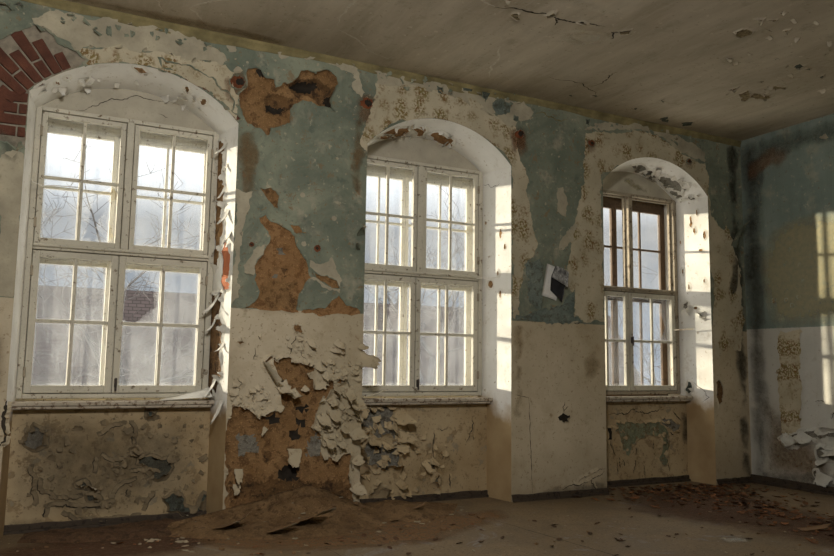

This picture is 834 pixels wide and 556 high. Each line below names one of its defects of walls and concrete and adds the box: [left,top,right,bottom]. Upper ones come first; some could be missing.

crack [481,0,627,39]
flaking render [0,22,102,151]
spalling [131,52,340,140]
peeling [629,163,708,254]
spalling [199,137,449,509]
peeling [777,418,834,487]